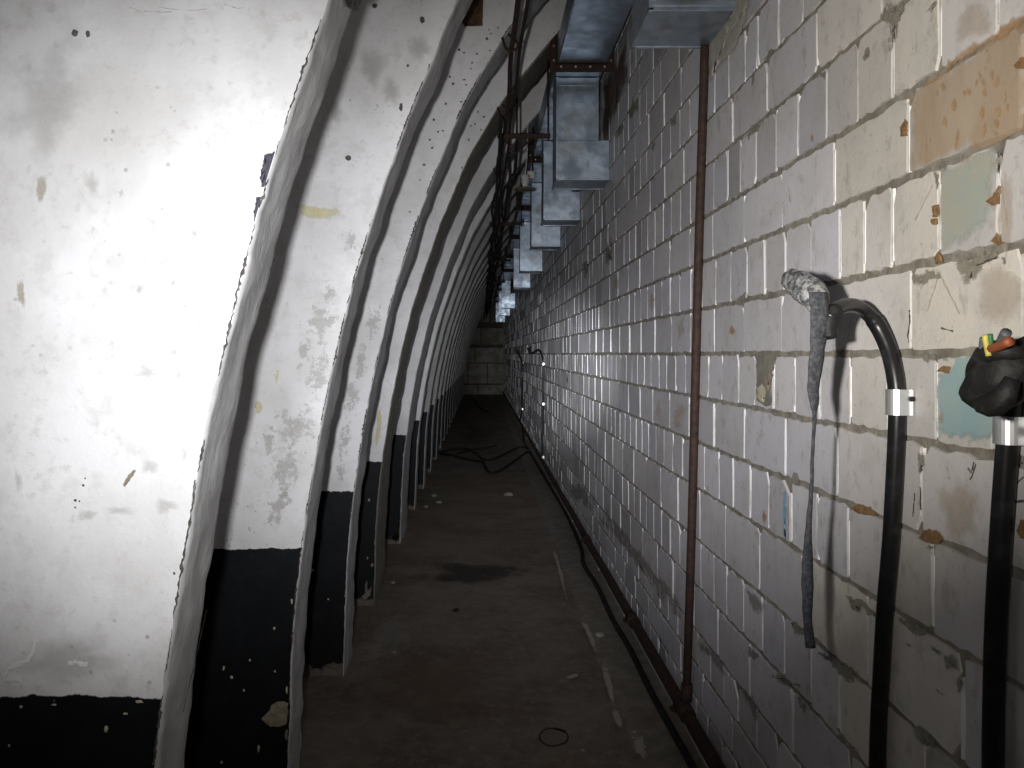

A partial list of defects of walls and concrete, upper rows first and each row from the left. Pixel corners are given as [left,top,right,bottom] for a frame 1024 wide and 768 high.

peeling [253,151,275,221]
peeling [985,186,1001,206]
peeling [930,204,940,225]
spalling [756,354,776,407]
peeling [850,504,878,516]
peeling [919,529,943,545]
spalling [262,686,289,740]